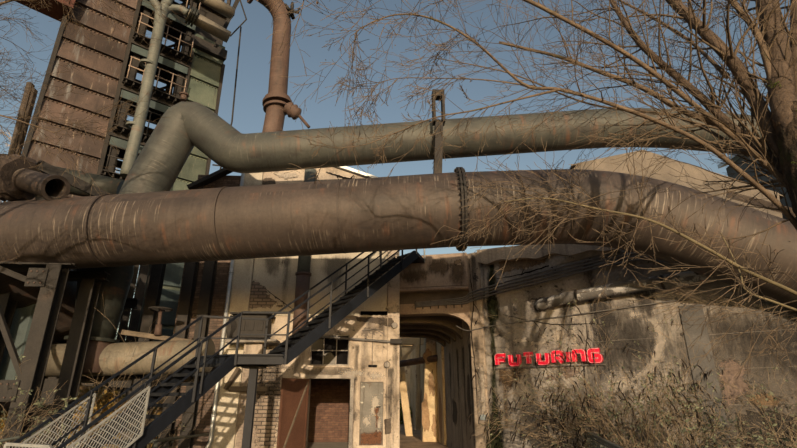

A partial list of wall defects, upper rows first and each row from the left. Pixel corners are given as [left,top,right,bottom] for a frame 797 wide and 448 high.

peeling [249,280,283,309]
leakage [327,258,346,287]
leakage [401,255,504,448]
leakage [562,304,573,335]
leakage [599,290,665,397]
peeling [253,365,282,448]